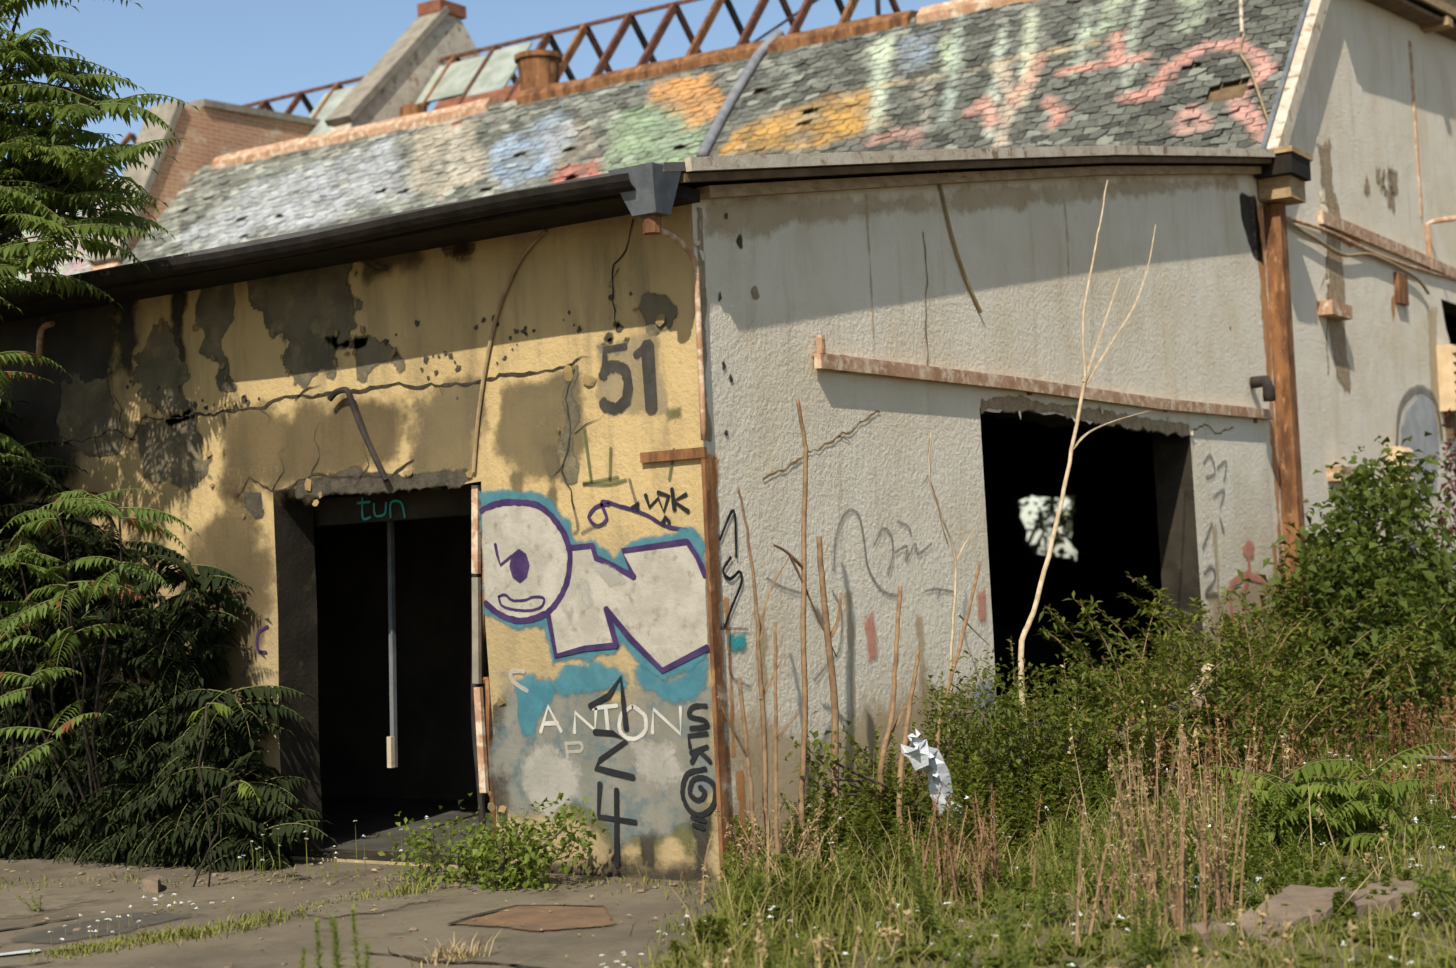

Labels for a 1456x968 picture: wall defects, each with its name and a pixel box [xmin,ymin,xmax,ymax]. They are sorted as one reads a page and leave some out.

rust [429,83,521,135]
peeling [56,262,461,493]
crack [55,356,604,509]
spalling [474,315,535,365]
crack [609,219,634,329]
rust [1255,204,1273,383]
rust [1269,401,1285,622]